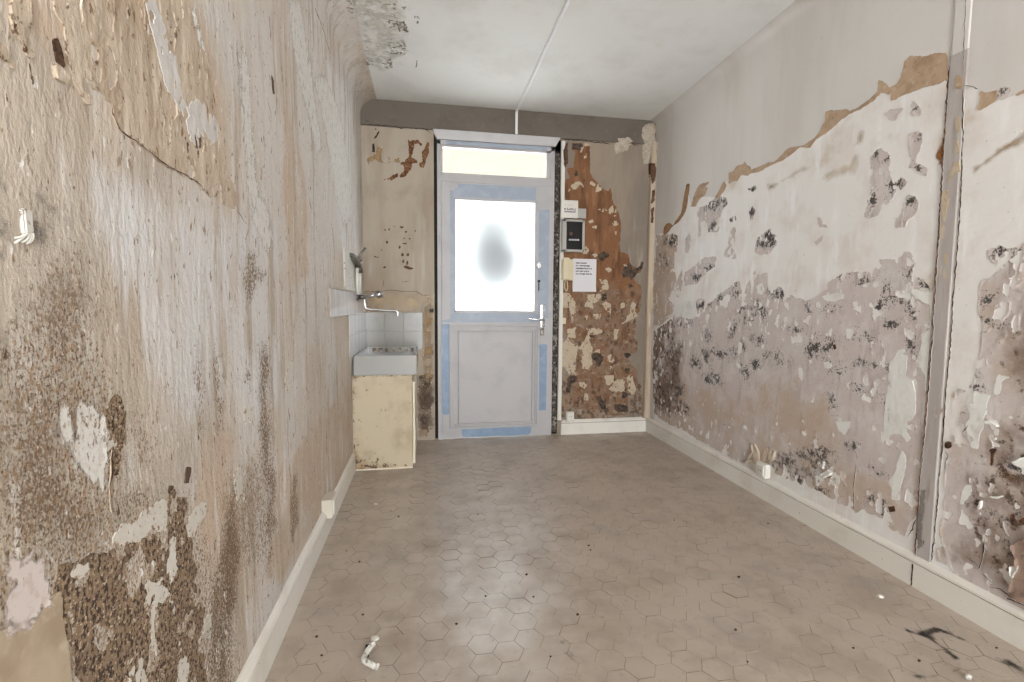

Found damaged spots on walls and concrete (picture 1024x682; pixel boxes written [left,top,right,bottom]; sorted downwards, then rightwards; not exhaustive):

flaking render [52,0,237,209]
crack [111,106,203,187]
spalling [563,142,590,167]
peeling [568,181,602,192]
peeling [588,206,619,235]
spalling [648,163,656,223]
peeling [562,267,638,401]
spalling [883,277,933,512]
spalling [951,375,1010,466]
spalling [960,485,972,505]
spalling [0,394,243,682]
peeling [1007,539,1024,606]